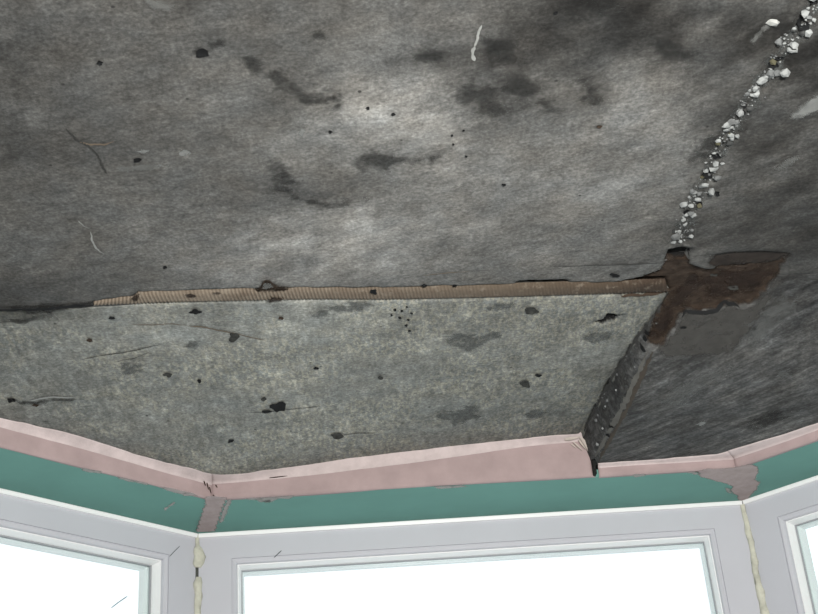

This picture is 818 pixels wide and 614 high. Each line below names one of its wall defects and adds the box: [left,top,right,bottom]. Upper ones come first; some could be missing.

rust [621,253,786,345]